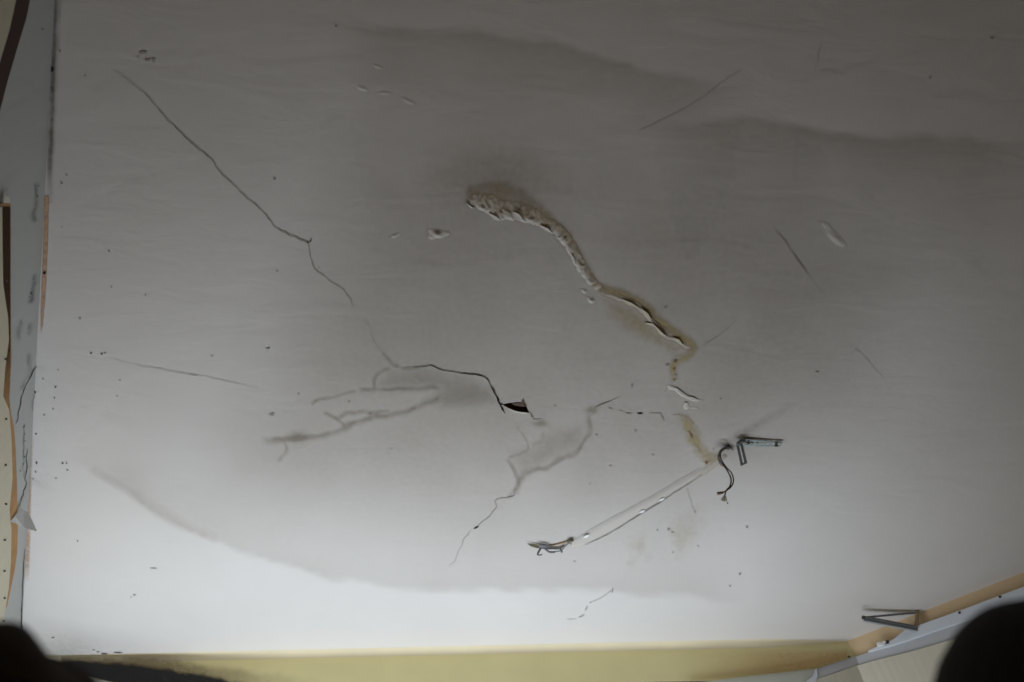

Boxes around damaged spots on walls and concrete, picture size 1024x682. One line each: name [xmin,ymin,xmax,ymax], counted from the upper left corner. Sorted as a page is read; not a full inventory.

crack [115,71,382,353]
peeling [602,293,693,351]
crack [403,365,542,420]
peeling [663,384,704,411]
crack [450,489,516,565]